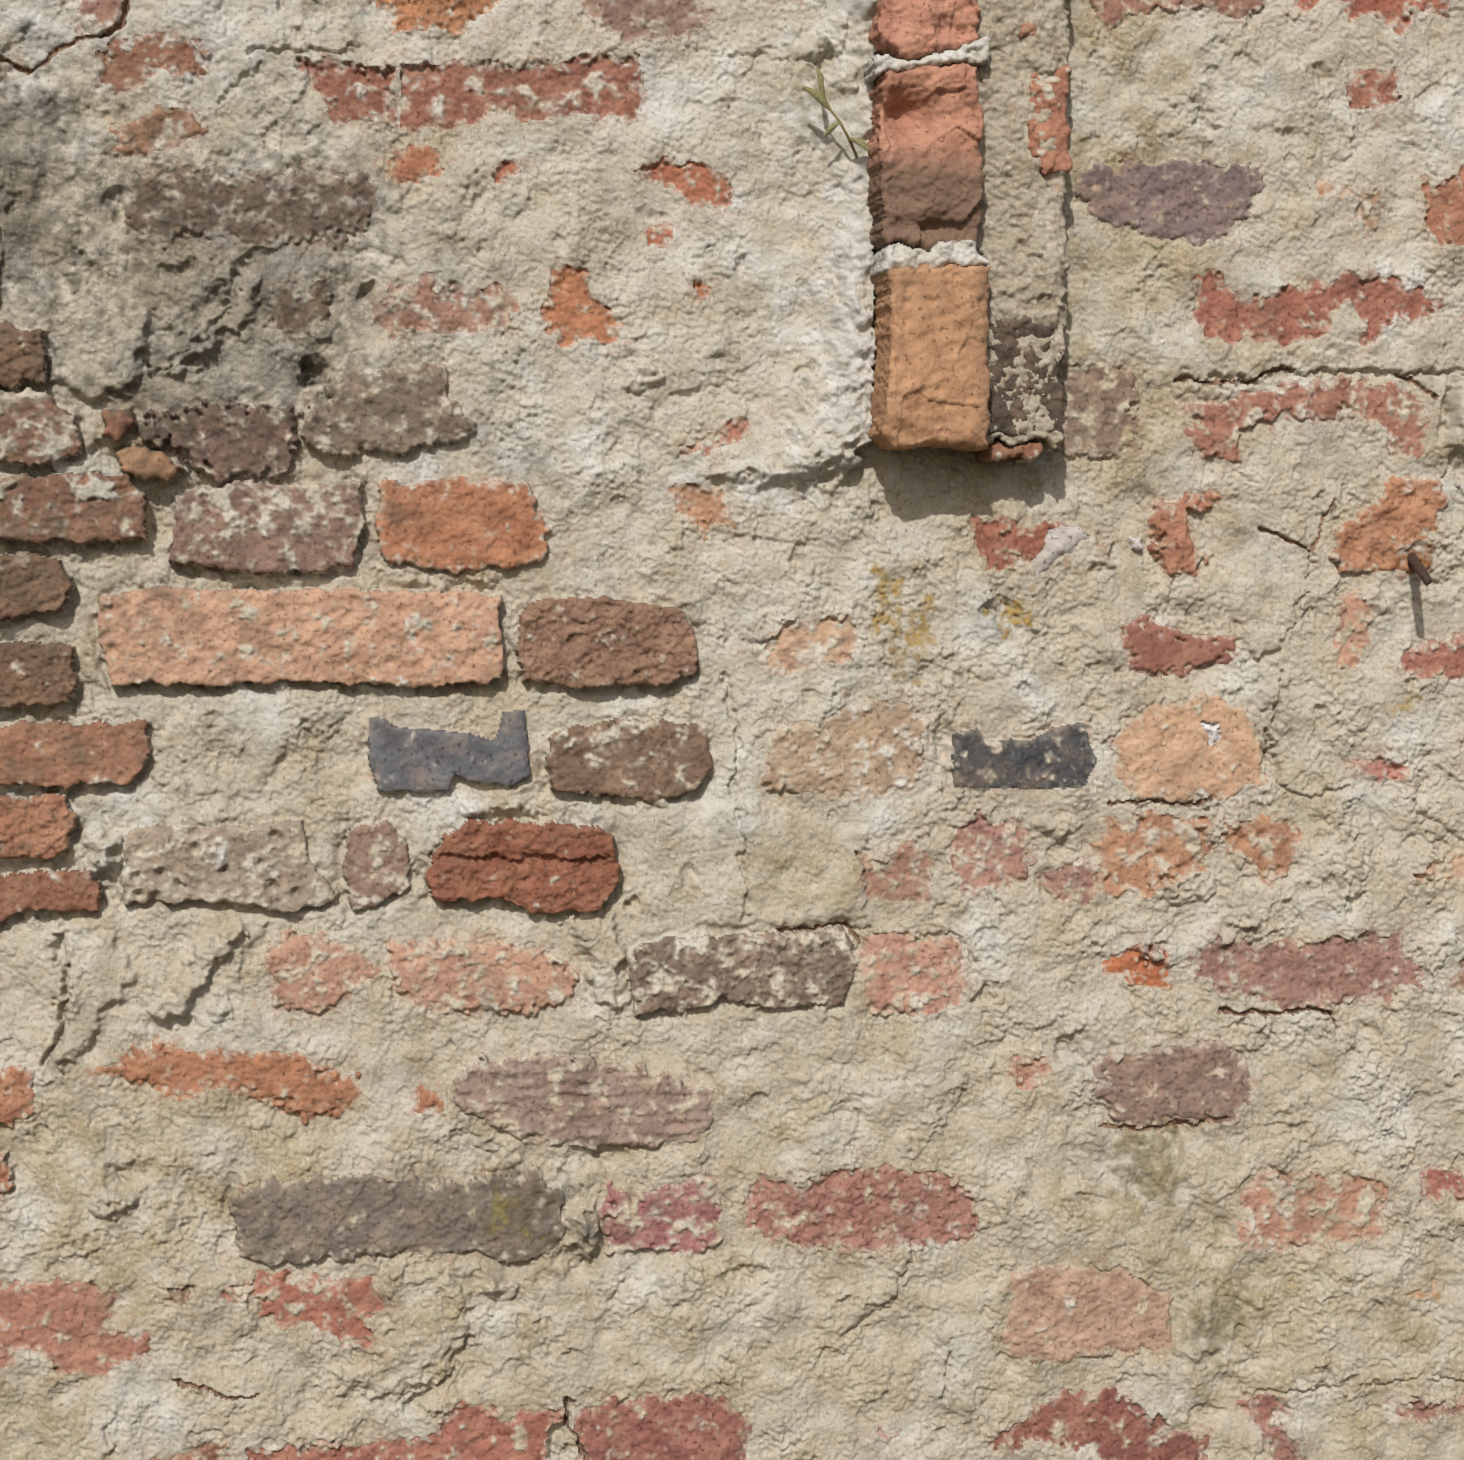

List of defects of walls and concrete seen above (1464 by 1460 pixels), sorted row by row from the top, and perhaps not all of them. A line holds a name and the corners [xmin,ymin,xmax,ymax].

crack [0,0,130,75]
spalling [369,271,520,341]
spalling [540,264,625,349]
crack [1174,364,1296,385]
crack [1394,373,1440,400]
spalling [0,322,148,621]
spalling [98,362,699,689]
spalling [0,641,152,922]
spalling [368,710,713,802]
spalling [120,817,621,1018]
spalling [628,925,968,1017]
crack [1217,1006,1338,1029]